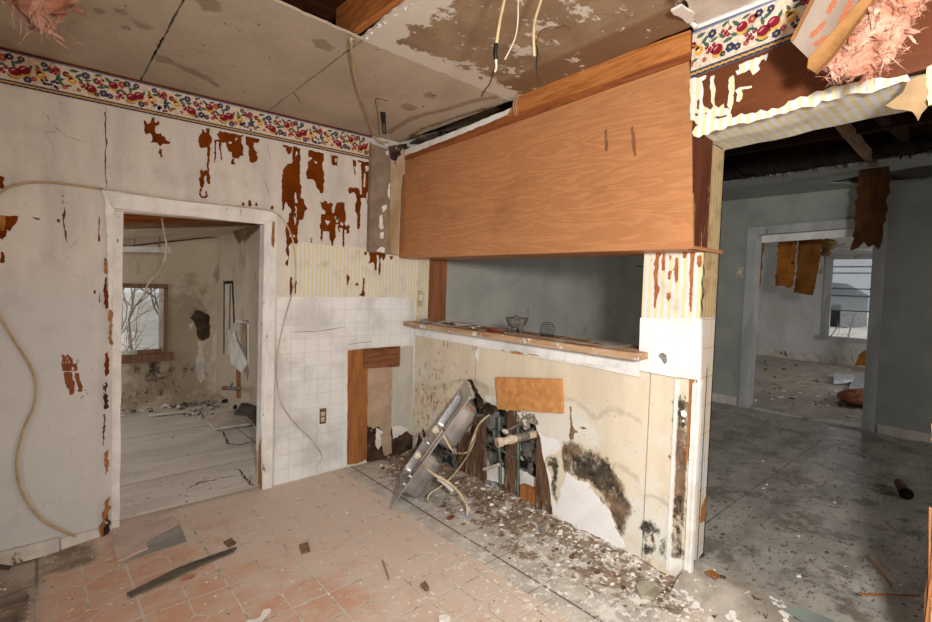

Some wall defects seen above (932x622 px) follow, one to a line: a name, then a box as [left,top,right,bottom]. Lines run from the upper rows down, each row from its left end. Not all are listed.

peeling [144,117,170,157]
peeling [198,128,260,198]
peeling [0,215,18,240]
peeling [271,145,369,266]
peeling [653,252,702,312]
spalling [94,258,113,474]
spalling [189,310,217,392]
leakage [548,406,635,533]
leakage [640,397,690,576]